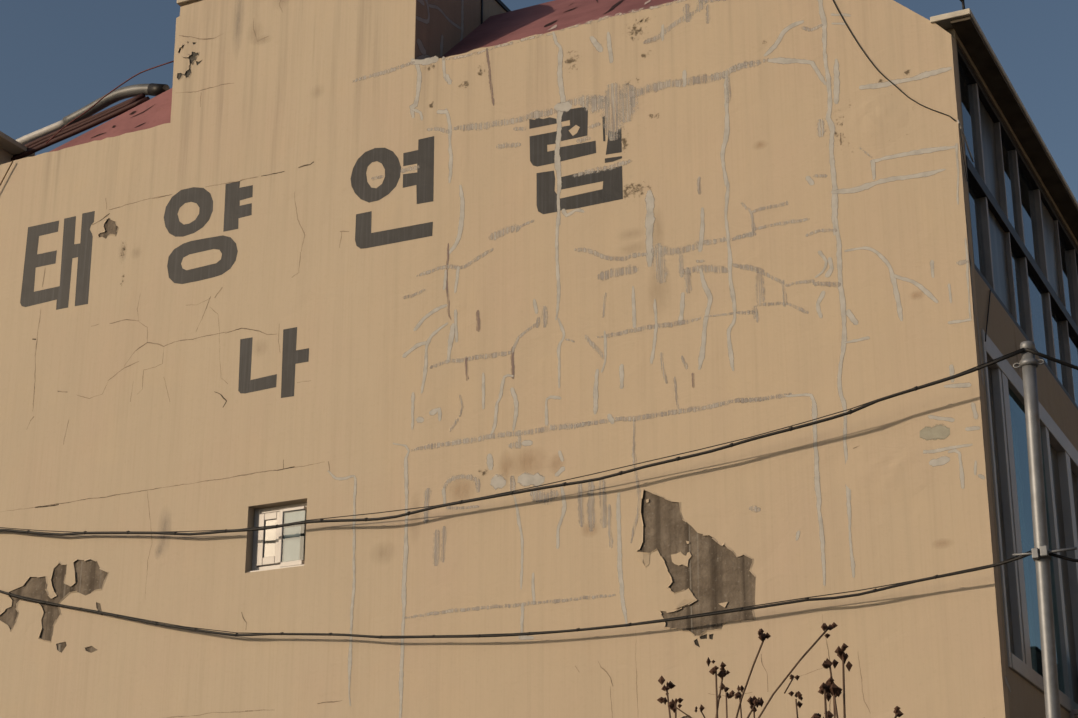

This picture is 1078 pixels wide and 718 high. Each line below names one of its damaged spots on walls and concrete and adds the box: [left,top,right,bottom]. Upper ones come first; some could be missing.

peeling [177,42,201,80]
peeling [0,558,109,653]
peeling [635,489,756,647]